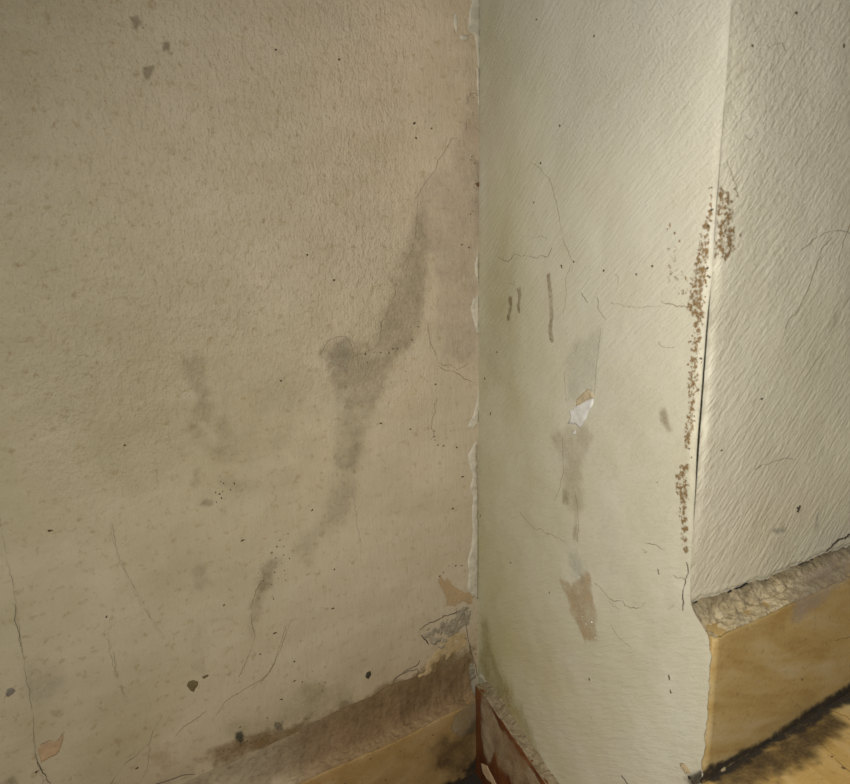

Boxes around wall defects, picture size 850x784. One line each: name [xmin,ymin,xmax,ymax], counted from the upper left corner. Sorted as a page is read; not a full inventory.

crack [782,224,850,339]
flaking render [568,389,594,435]
flaking render [392,441,478,683]